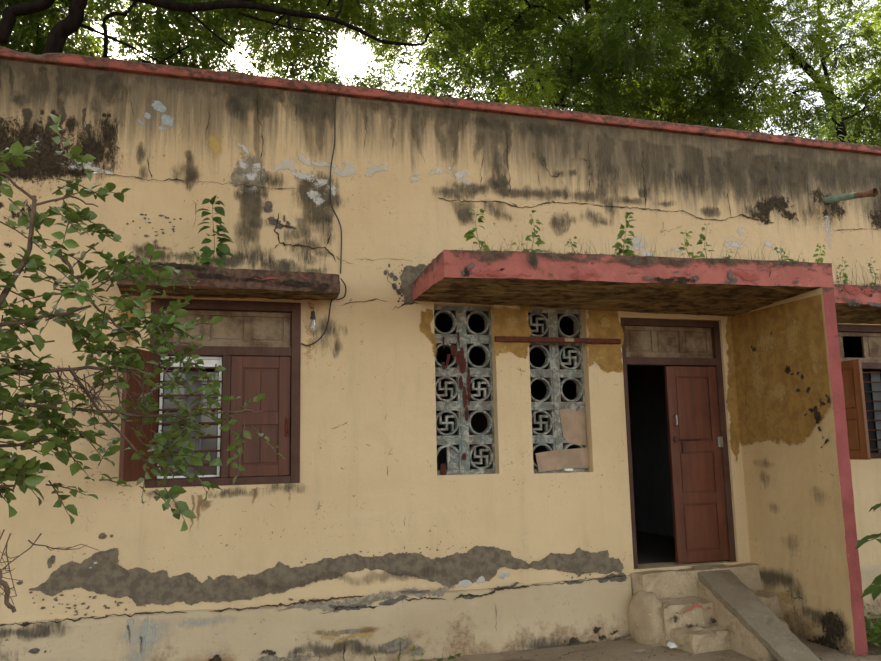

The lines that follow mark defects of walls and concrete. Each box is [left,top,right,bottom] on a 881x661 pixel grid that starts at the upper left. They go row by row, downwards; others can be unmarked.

leakage [0,59,124,231]
peeling [239,159,295,191]
leakage [437,108,881,249]
crack [274,214,416,310]
spalling [384,264,404,302]
peeling [750,320,831,448]
crack [0,611,187,627]
crack [209,596,378,614]
peeling [17,545,627,616]
leakage [278,628,425,661]
crack [405,575,625,631]
leakage [759,570,850,651]